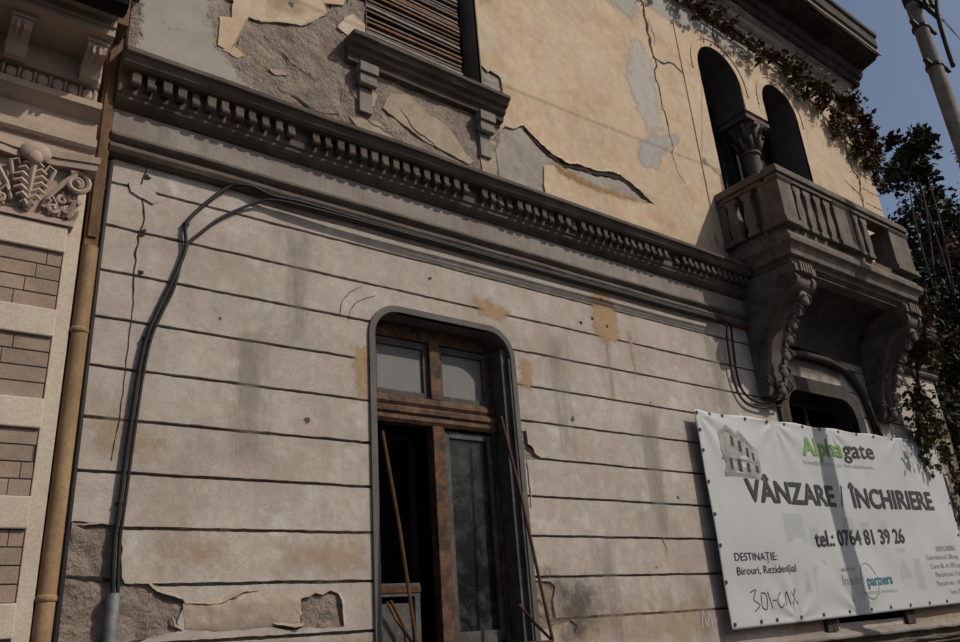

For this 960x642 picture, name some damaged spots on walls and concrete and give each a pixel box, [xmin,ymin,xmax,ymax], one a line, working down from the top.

flaking render [128,2,144,47]
flaking render [206,0,654,204]
crack [524,128,652,204]
peeling [625,38,680,170]
crack [641,0,685,181]
crack [111,167,172,461]
flaking render [58,521,186,642]
flaking render [301,589,346,628]